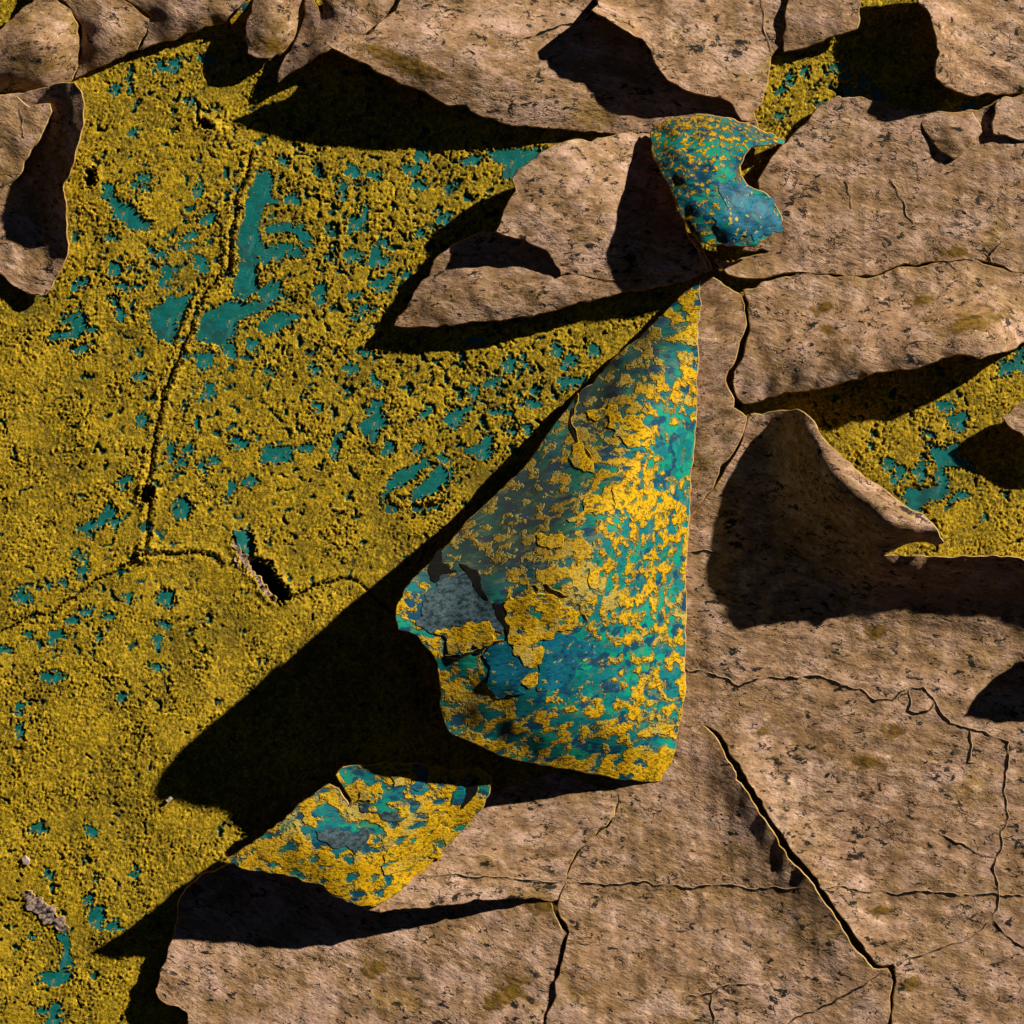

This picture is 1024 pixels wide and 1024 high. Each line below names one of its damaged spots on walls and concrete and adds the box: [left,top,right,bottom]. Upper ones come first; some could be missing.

peeling [46,310,99,358]
crack [144,155,251,530]
peeling [105,153,316,476]
peeling [0,0,862,328]
peeling [714,0,1024,404]
crack [1,555,140,632]
peeling [21,592,136,648]
peeling [43,503,123,591]
peeling [147,587,180,674]
peeling [155,276,1024,1024]
spalling [22,889,76,1024]
crack [422,668,1024,1024]